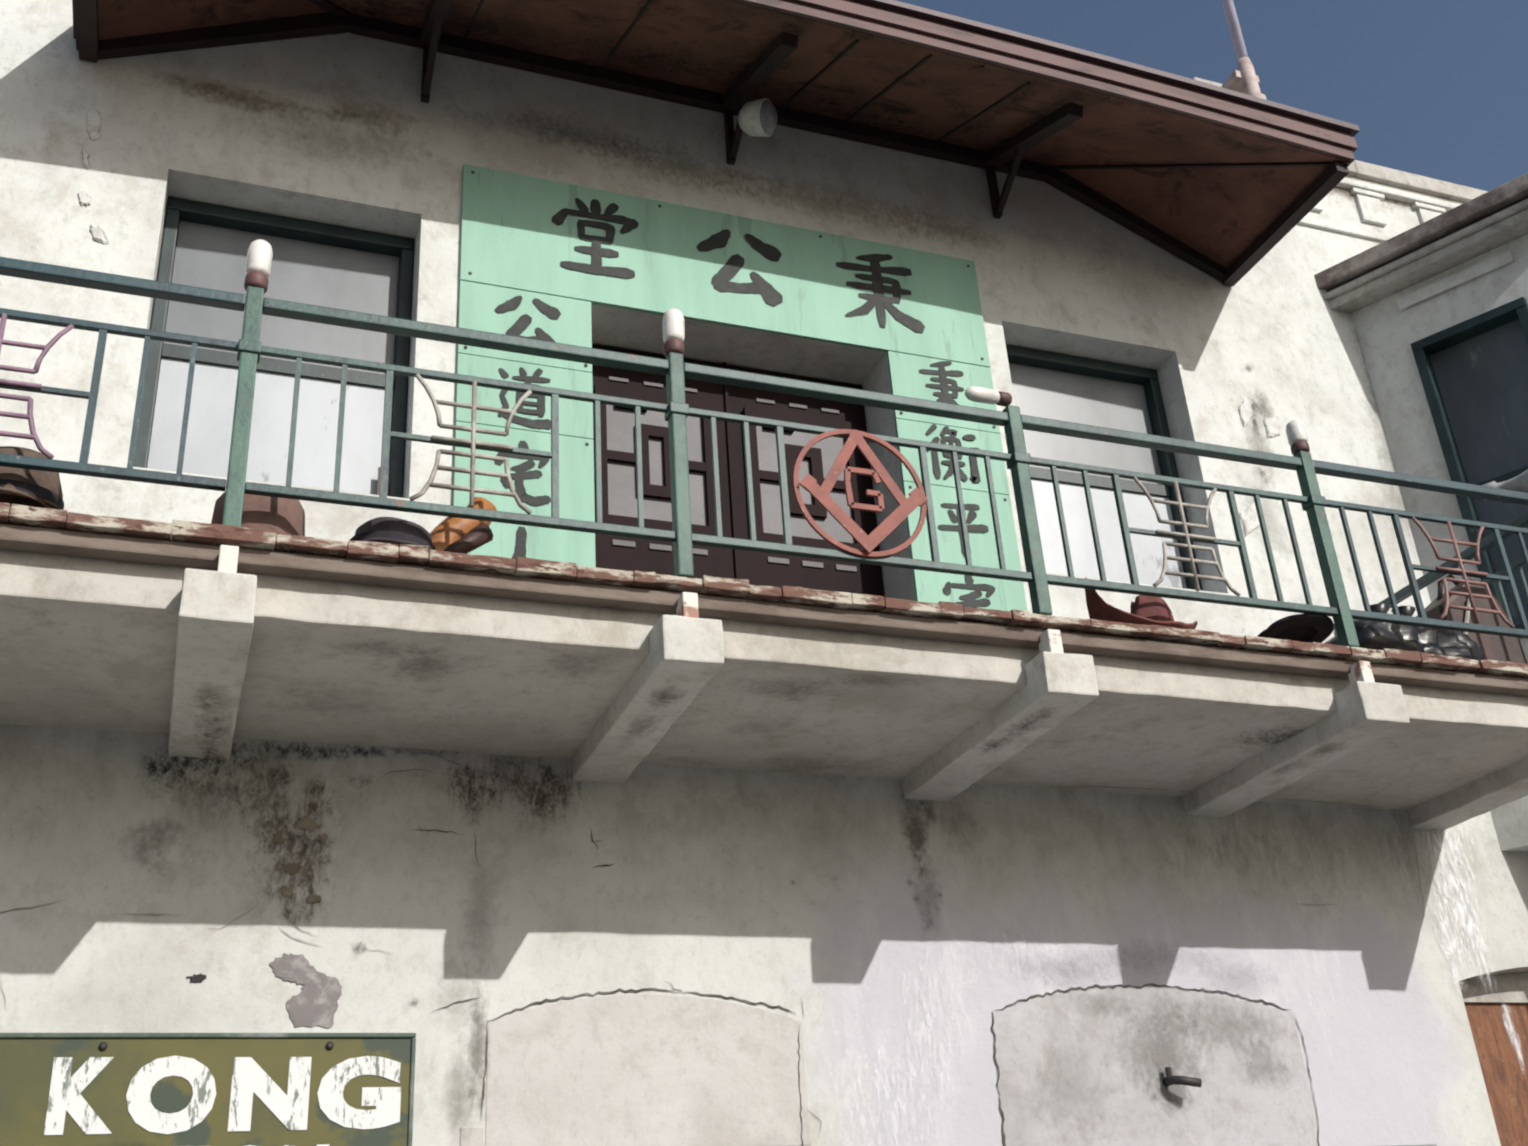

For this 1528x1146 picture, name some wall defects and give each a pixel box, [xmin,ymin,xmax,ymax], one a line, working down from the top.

water stain [148,743,380,784]
peeling [269,953,342,1028]